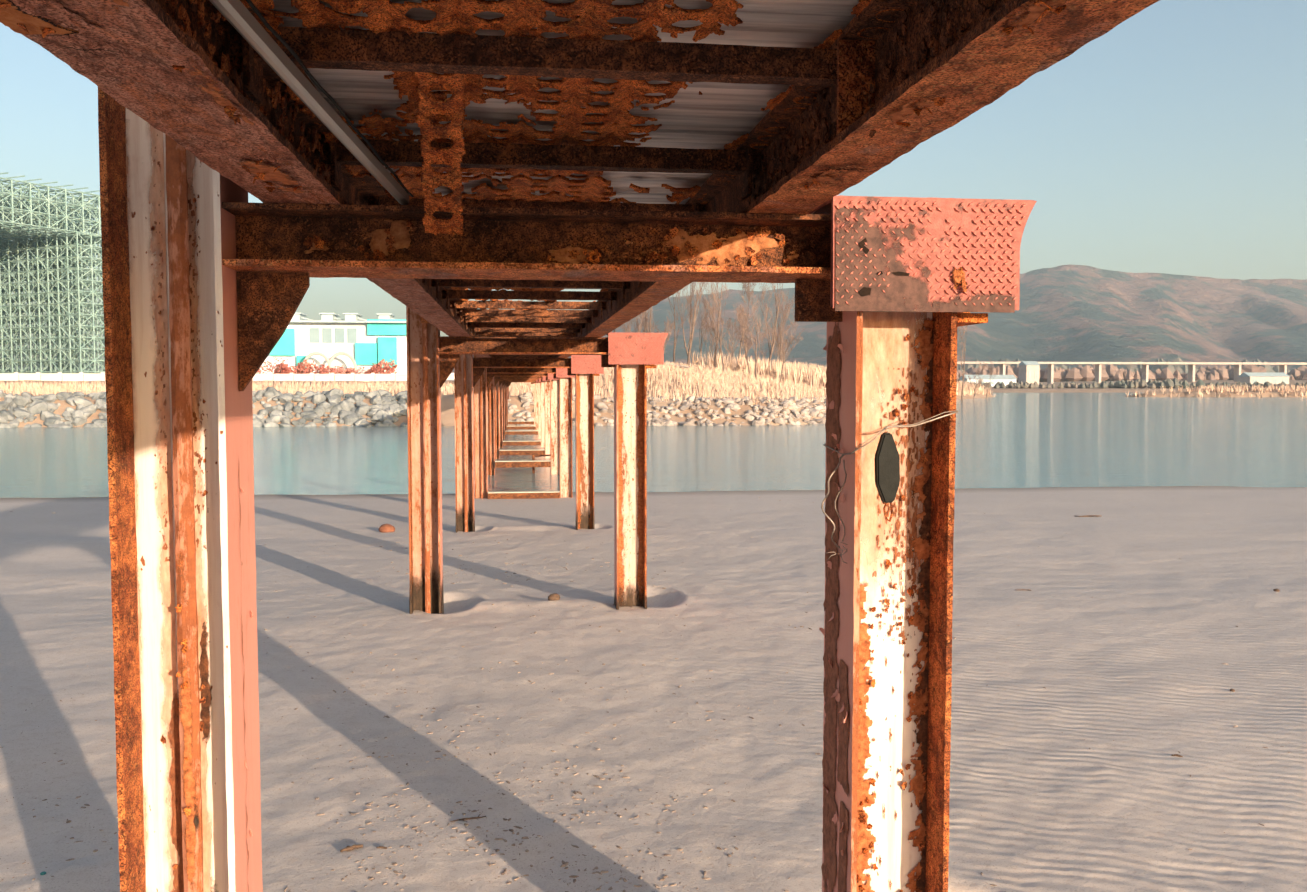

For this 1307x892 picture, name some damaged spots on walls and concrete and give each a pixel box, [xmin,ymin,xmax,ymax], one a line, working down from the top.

corrosion [986,0,1067,49]
corrosion [167,0,332,193]
corrosion [351,219,413,261]
corrosion [547,245,602,264]
corrosion [645,226,800,266]
corrosion [146,125,217,892]
corrosion [819,207,1015,892]